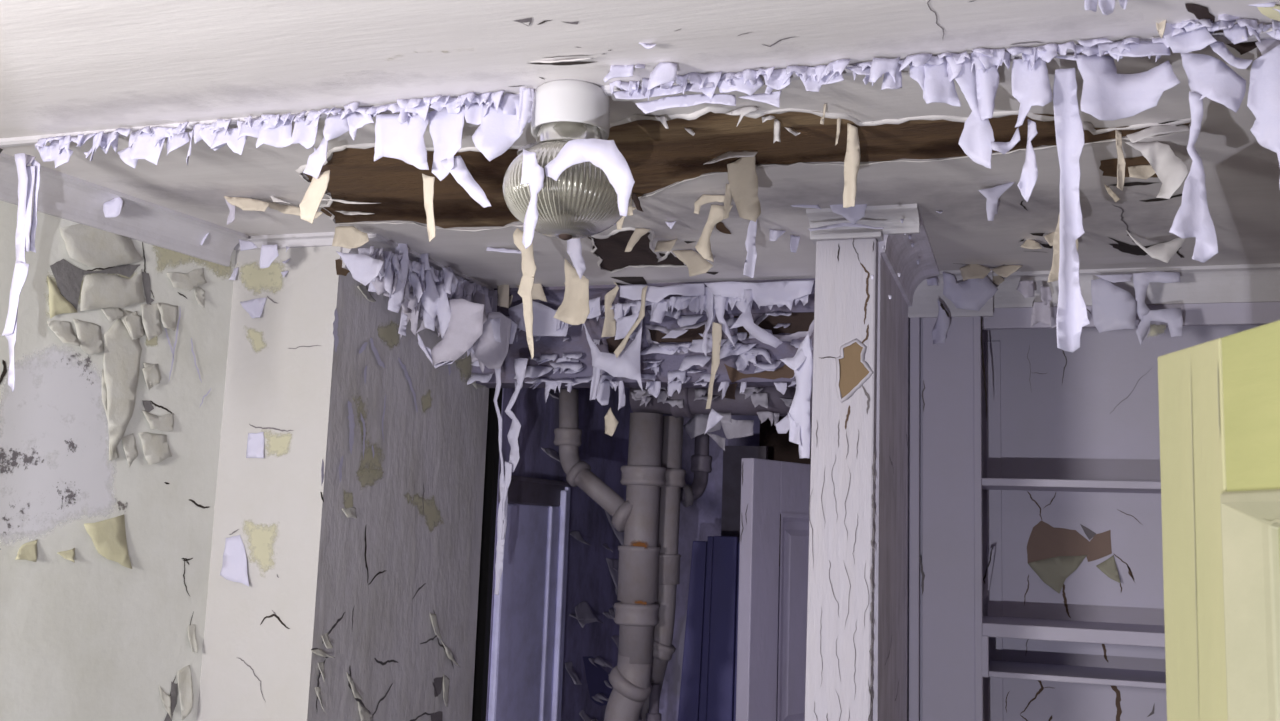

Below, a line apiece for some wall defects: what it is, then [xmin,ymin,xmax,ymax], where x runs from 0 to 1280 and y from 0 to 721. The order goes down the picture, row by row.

peeling [0,153,181,543]
peeling [35,2,1280,595]
crack [837,232,874,324]
crack [979,316,987,417]
damp [0,448,44,474]
crack [260,492,398,721]
crack [809,423,872,721]
peeling [1024,491,1135,618]
peeling [159,612,198,721]
crack [239,658,266,703]
spalling [410,609,460,721]
peeling [1110,685,1122,721]